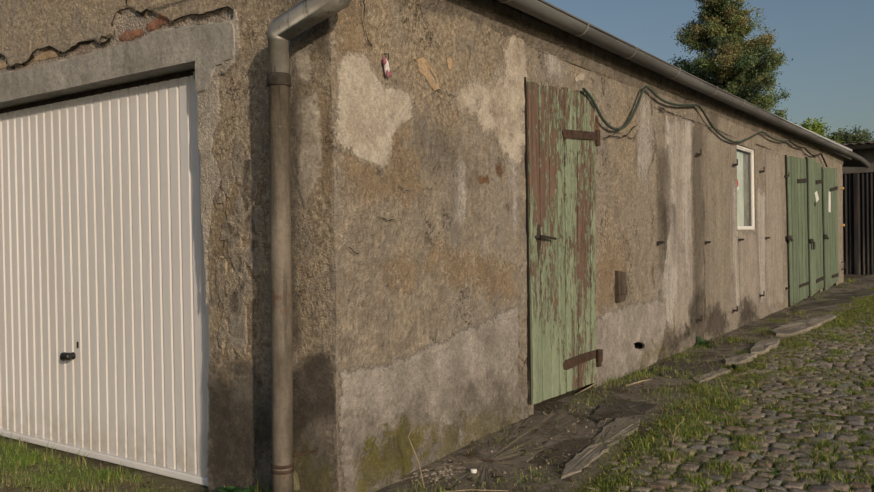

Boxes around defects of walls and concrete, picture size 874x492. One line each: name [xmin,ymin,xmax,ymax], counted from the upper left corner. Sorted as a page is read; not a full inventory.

spalling [0,7,233,73]
peeling [416,56,440,93]
water stain [637,86,726,359]
water stain [207,363,272,492]
water stain [293,353,338,492]